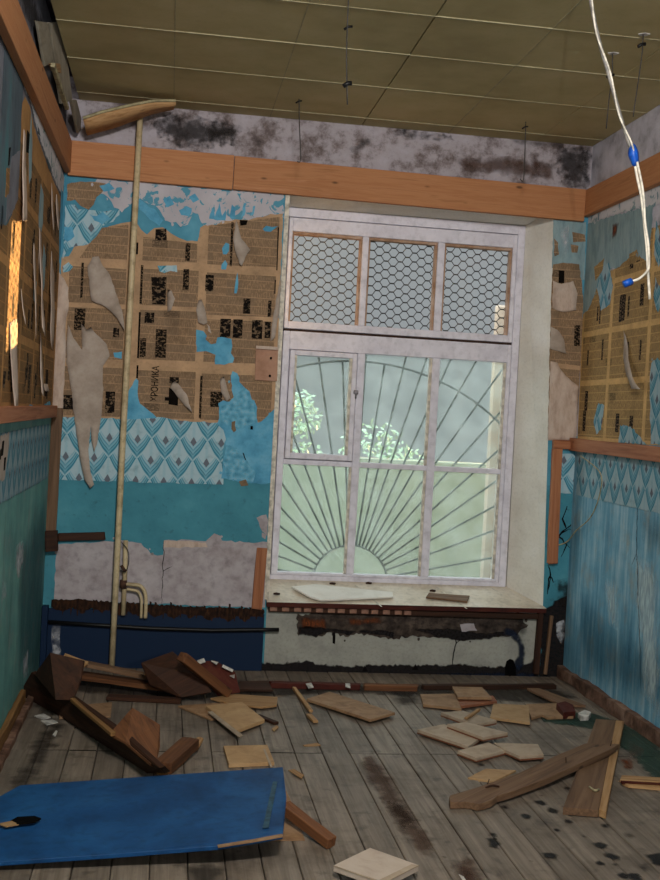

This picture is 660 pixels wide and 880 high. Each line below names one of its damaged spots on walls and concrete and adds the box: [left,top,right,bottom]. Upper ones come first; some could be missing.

mould [23,0,42,42]
peeling [0,48,64,226]
mould [132,116,236,146]
leakage [463,148,592,187]
peeling [91,179,285,227]
peeling [552,185,660,314]
flaking render [54,515,268,608]
crack [547,507,571,594]
flaking render [296,613,528,644]
hole [505,659,516,676]